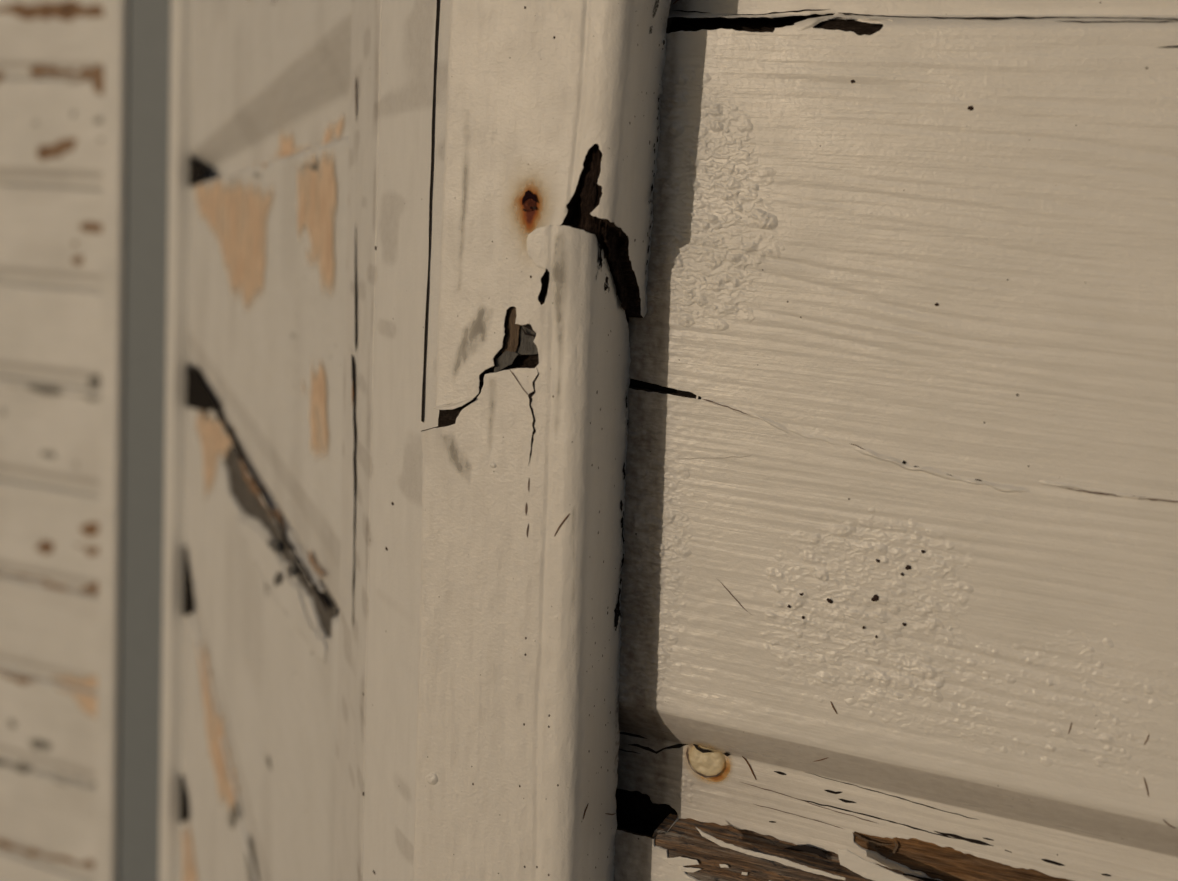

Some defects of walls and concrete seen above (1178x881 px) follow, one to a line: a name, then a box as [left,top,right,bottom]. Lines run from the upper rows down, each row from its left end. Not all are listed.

peeling [0,1,103,20]
crack [673,9,1178,48]
peeling [31,65,104,94]
peeling [196,116,343,308]
corrosion [514,184,543,233]
peeling [433,397,474,410]
crack [630,379,1178,503]
peeling [196,408,337,664]
corrosion [707,761,730,782]
crack [619,732,1012,853]
peeling [652,814,1072,881]
crack [1041,858,1065,866]